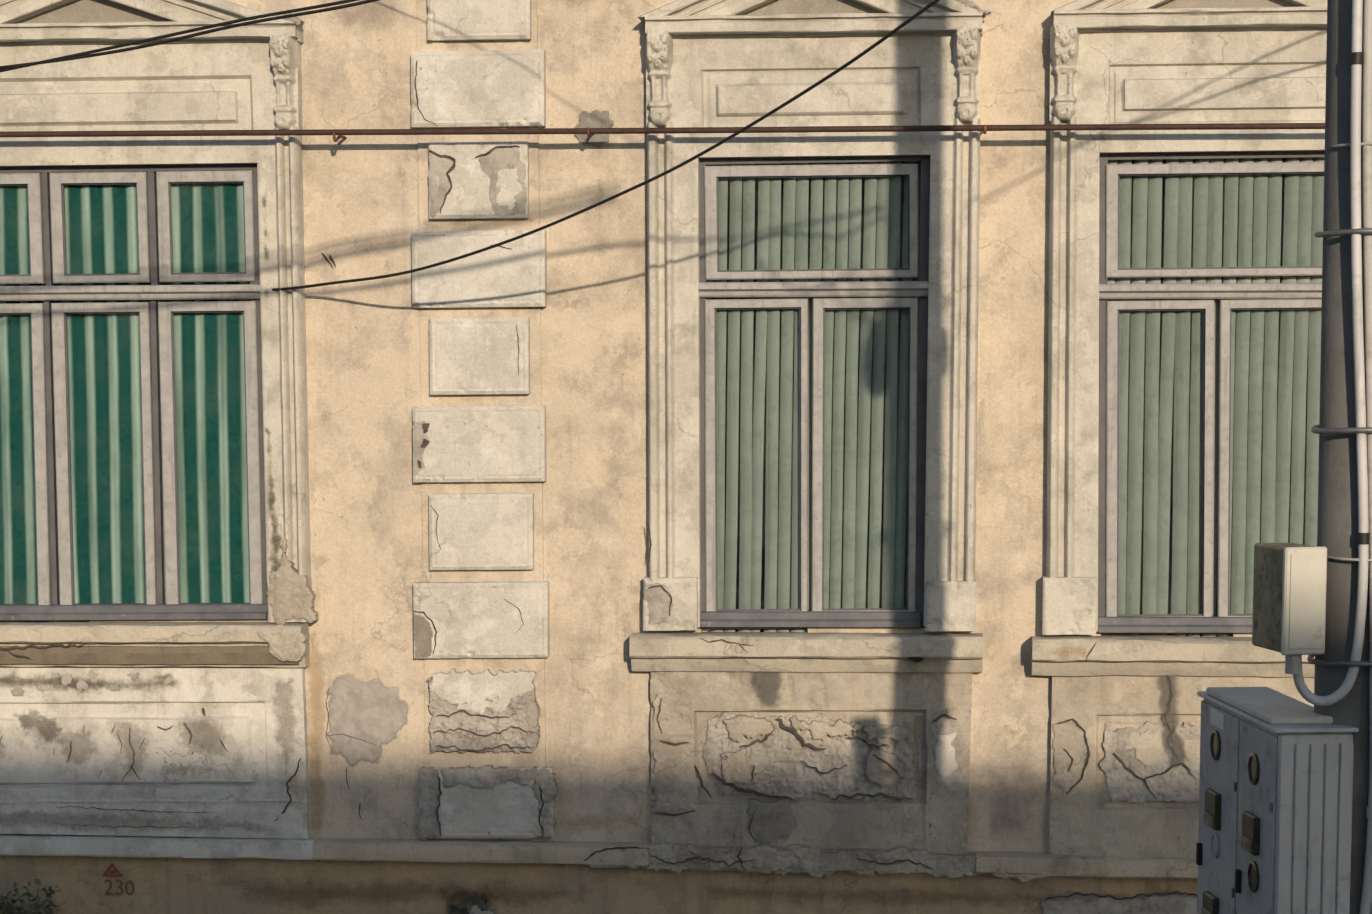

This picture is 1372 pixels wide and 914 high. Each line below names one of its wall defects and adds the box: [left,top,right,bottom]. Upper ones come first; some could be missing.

spalling [257,480,319,661]
spalling [417,668,558,841]
spalling [584,691,973,878]
spalling [1051,718,1200,804]
spalling [1041,891,1197,914]